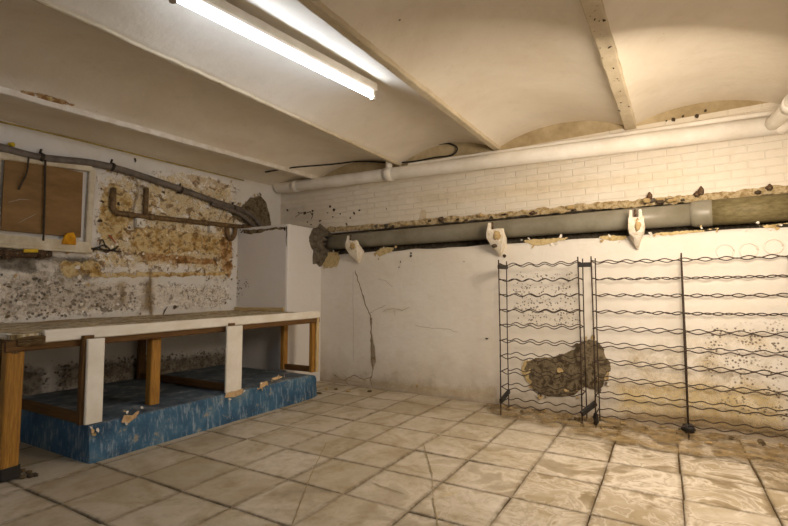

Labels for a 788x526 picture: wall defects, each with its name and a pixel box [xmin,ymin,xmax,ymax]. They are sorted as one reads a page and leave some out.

flaking render [297,184,788,232]
peeling [0,170,286,286]
flaking render [635,218,719,237]
flaking render [521,234,566,248]
flaking render [599,234,628,244]
flaking render [322,250,341,269]
crack [335,272,456,387]
damp [629,328,787,437]
spalling [122,406,143,425]